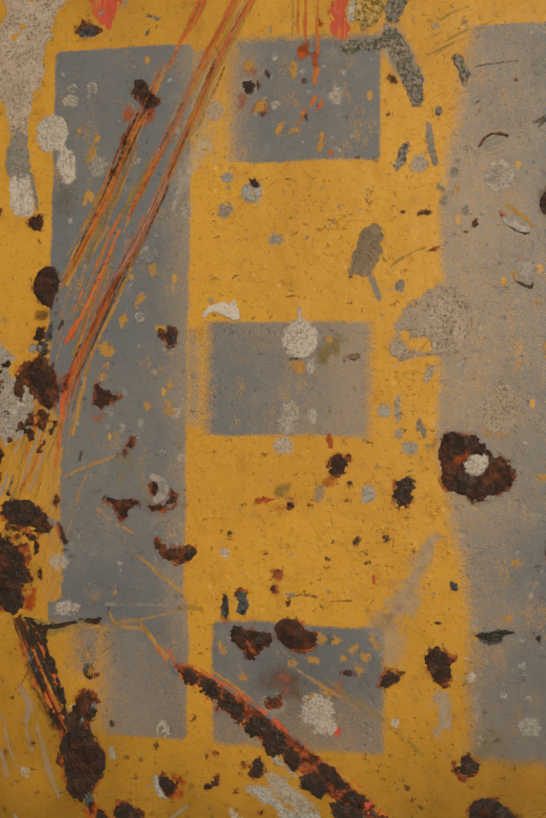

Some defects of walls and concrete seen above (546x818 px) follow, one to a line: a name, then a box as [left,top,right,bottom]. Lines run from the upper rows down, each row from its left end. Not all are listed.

peeling [85,0,121,30]
peeling [0,0,73,217]
peeling [394,277,409,298]
rust [0,263,71,413]
peeling [0,343,58,462]
rust [427,425,520,506]
rust [0,448,146,818]
rust [226,566,319,665]
rust [419,642,458,689]
rust [166,657,394,818]
peeling [245,768,321,818]
rust [464,794,524,818]